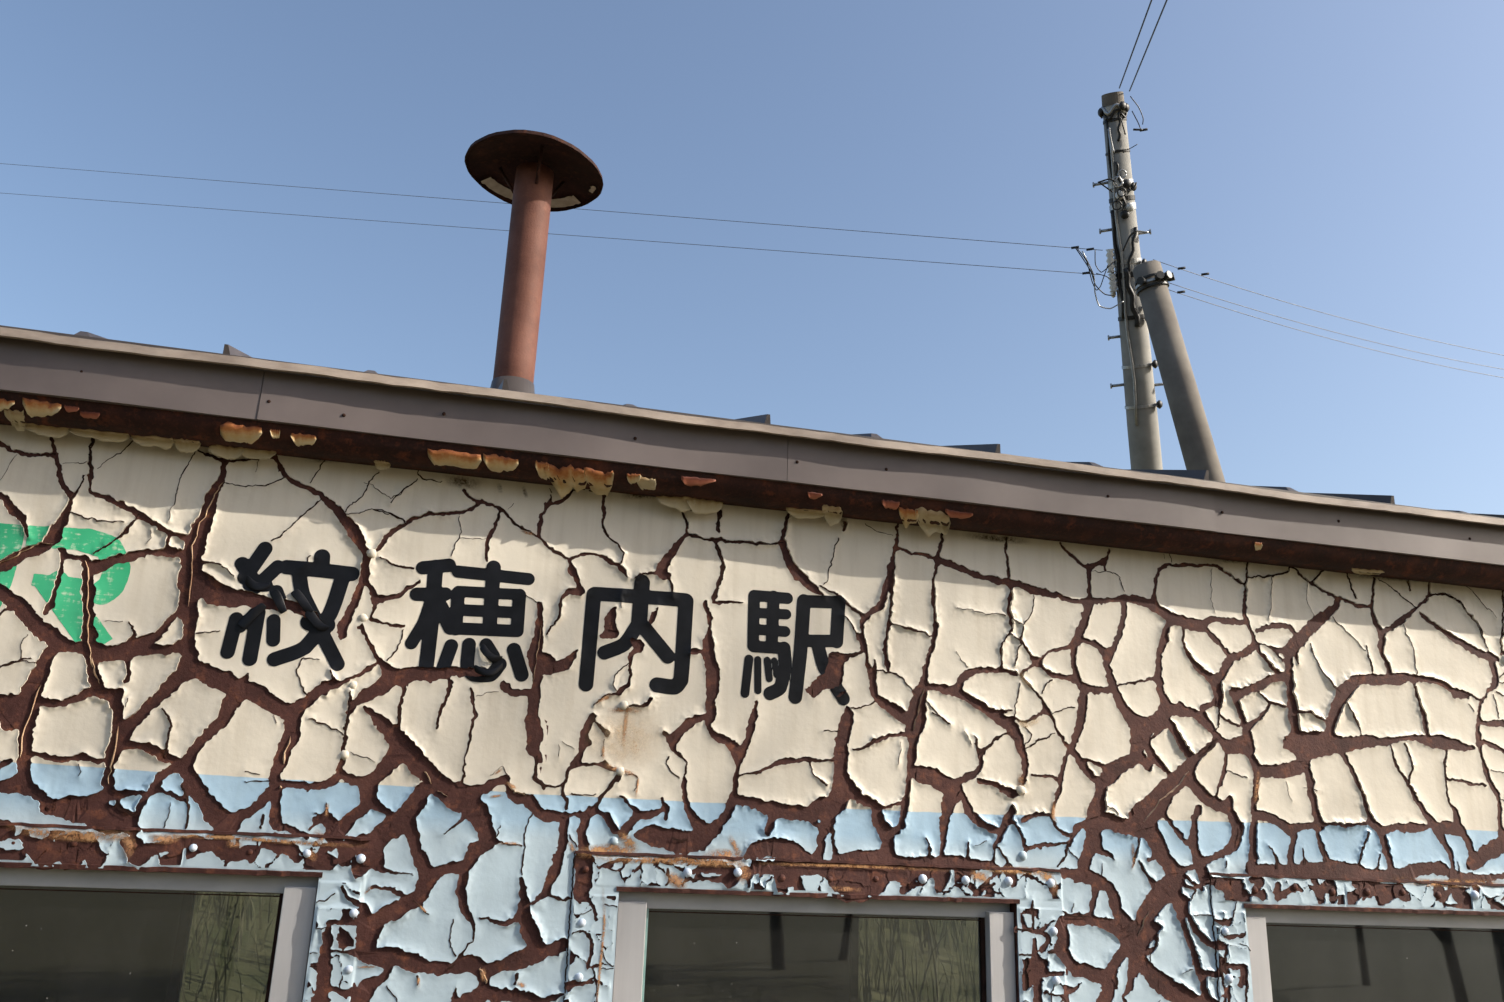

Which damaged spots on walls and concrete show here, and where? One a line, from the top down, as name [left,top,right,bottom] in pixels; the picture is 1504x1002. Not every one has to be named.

peeling [0,397,316,460]
peeling [428,448,723,515]
peeling [599,606,622,639]
peeling [805,648,863,698]
crack [0,437,1504,1002]
peeling [0,793,385,1002]
corrosion [570,834,750,887]
peeling [573,824,1060,919]
corrosion [972,867,1055,890]
peeling [1212,877,1504,919]
corrosion [598,915,606,984]
peeling [1020,909,1063,1002]